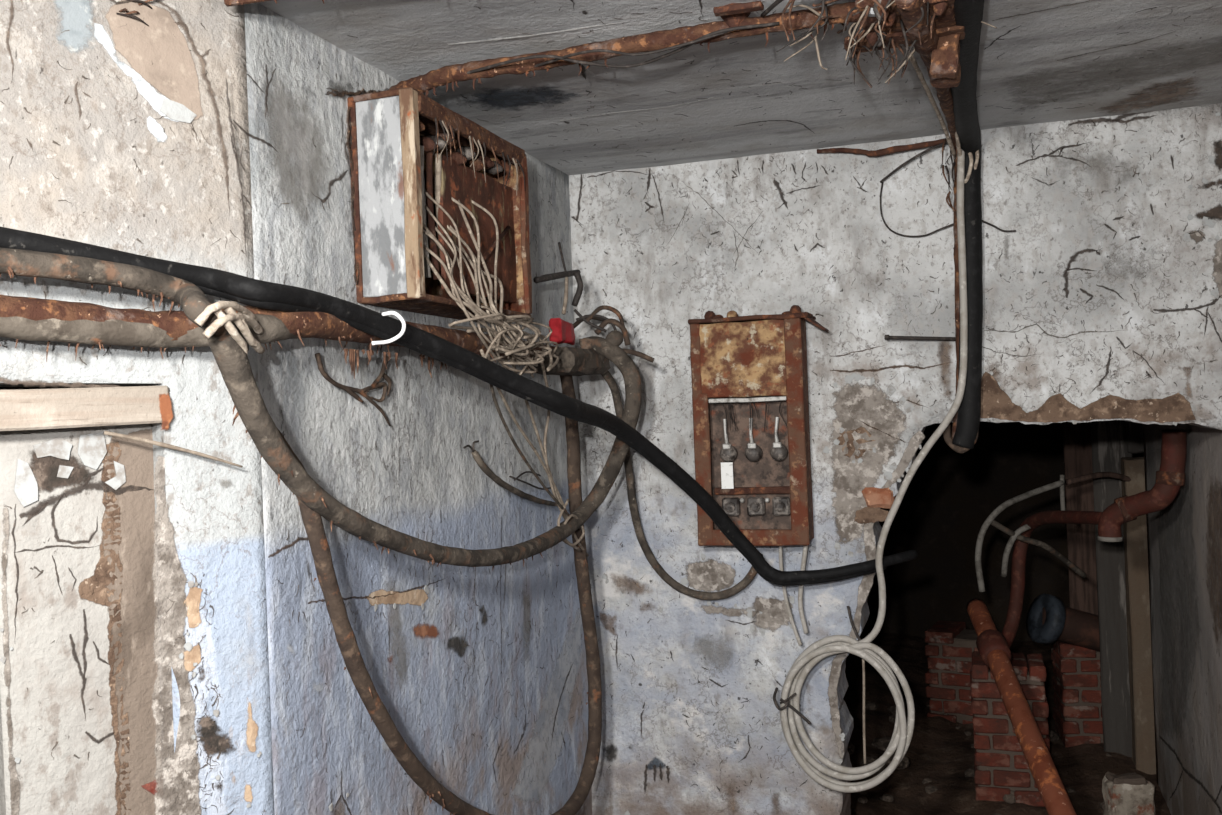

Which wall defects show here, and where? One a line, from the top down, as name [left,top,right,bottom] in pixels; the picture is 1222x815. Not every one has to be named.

crack [6,0,14,80]
flaking render [55,0,203,142]
crack [156,0,278,265]
crack [1016,112,1157,185]
crack [983,204,1164,392]
crack [1153,295,1222,342]
flaking render [980,369,1197,426]
flaking render [823,373,925,639]
crack [11,468,153,744]
flaking render [0,429,262,815]
flaking render [367,585,430,612]
flaking render [828,652,848,763]